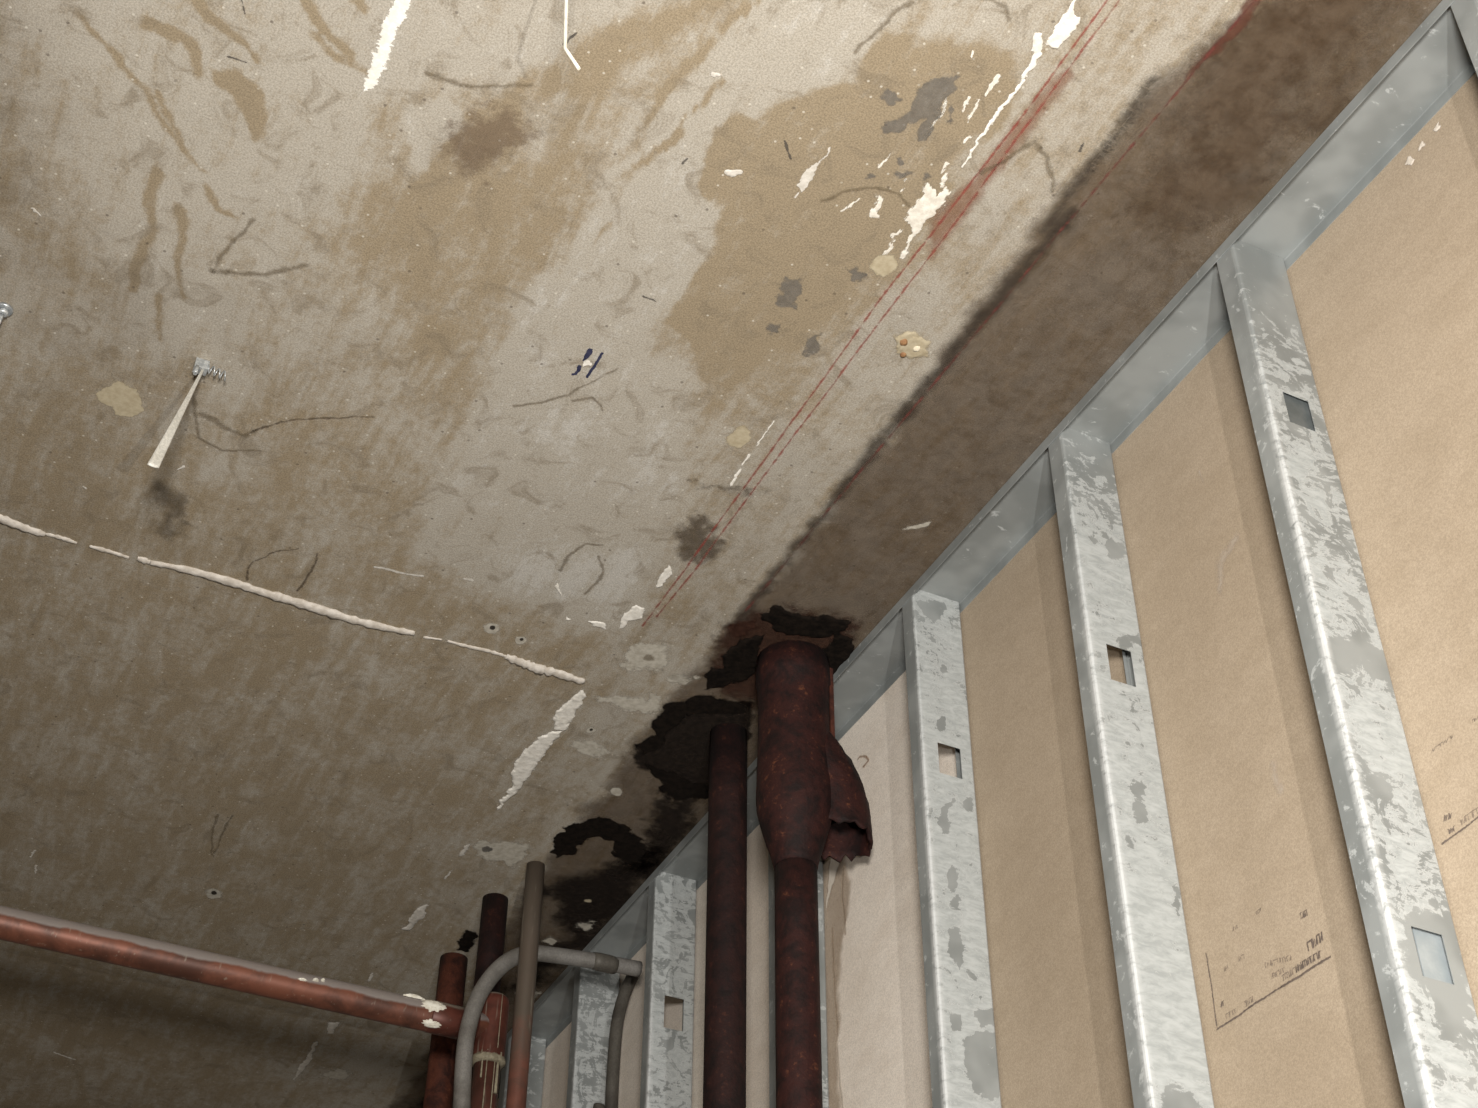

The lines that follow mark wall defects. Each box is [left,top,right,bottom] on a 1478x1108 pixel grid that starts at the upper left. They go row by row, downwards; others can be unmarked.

leakage [881,74,1001,144]
flaking render [961,0,1080,168]
leakage [865,153,929,192]
leakage [776,277,802,309]
leakage [803,335,819,357]
leakage [634,605,859,801]
flaking render [497,690,587,810]
leakage [826,858,839,908]